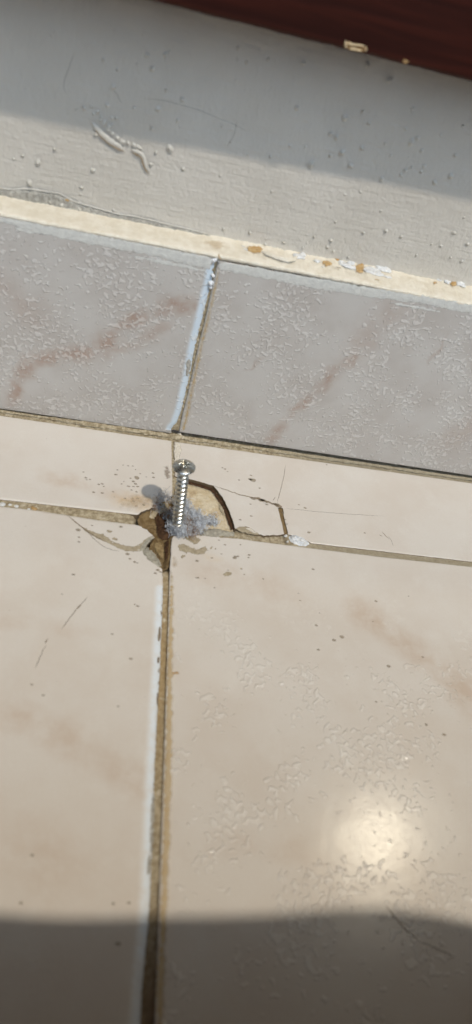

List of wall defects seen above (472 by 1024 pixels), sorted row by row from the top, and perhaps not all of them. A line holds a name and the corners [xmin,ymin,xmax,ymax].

crack [67,515,116,551]
spalling [85,465,258,574]